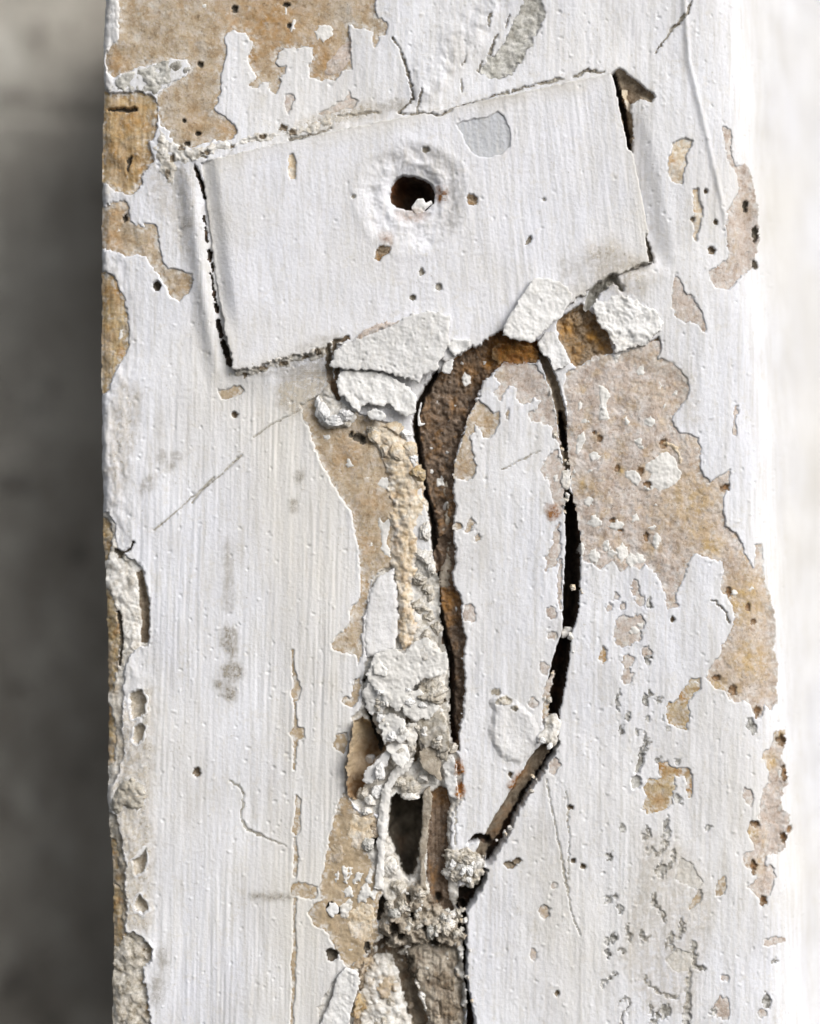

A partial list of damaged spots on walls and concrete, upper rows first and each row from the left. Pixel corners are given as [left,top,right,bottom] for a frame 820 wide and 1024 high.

peeling [101,272,129,394]
peeling [101,0,390,302]
peeling [690,127,761,289]
spalling [102,512,150,785]
spalling [109,812,152,1024]
spalling [218,295,471,1024]
crack [454,351,584,1024]
peeling [452,277,779,1024]
peeling [743,730,792,906]
peeling [764,936,786,964]